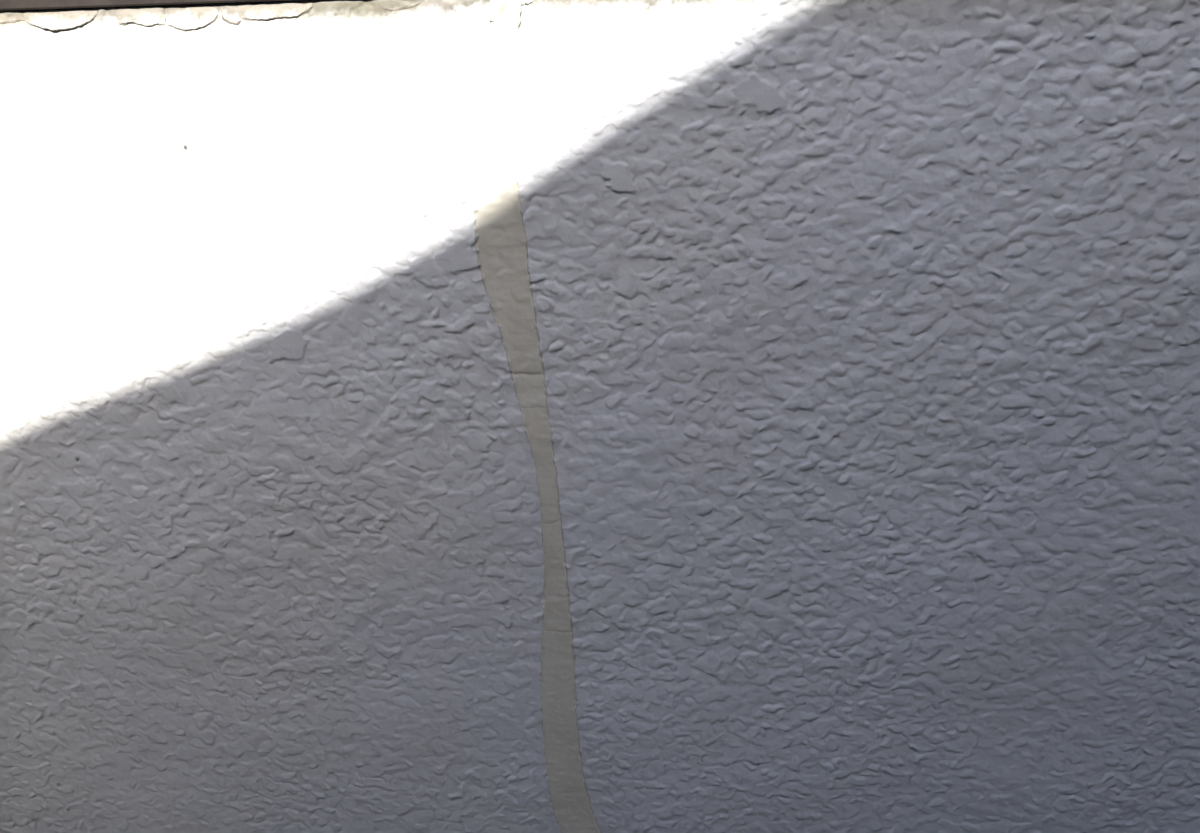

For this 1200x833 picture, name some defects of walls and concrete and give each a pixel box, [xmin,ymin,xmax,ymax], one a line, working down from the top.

crack [0,17,23,25]